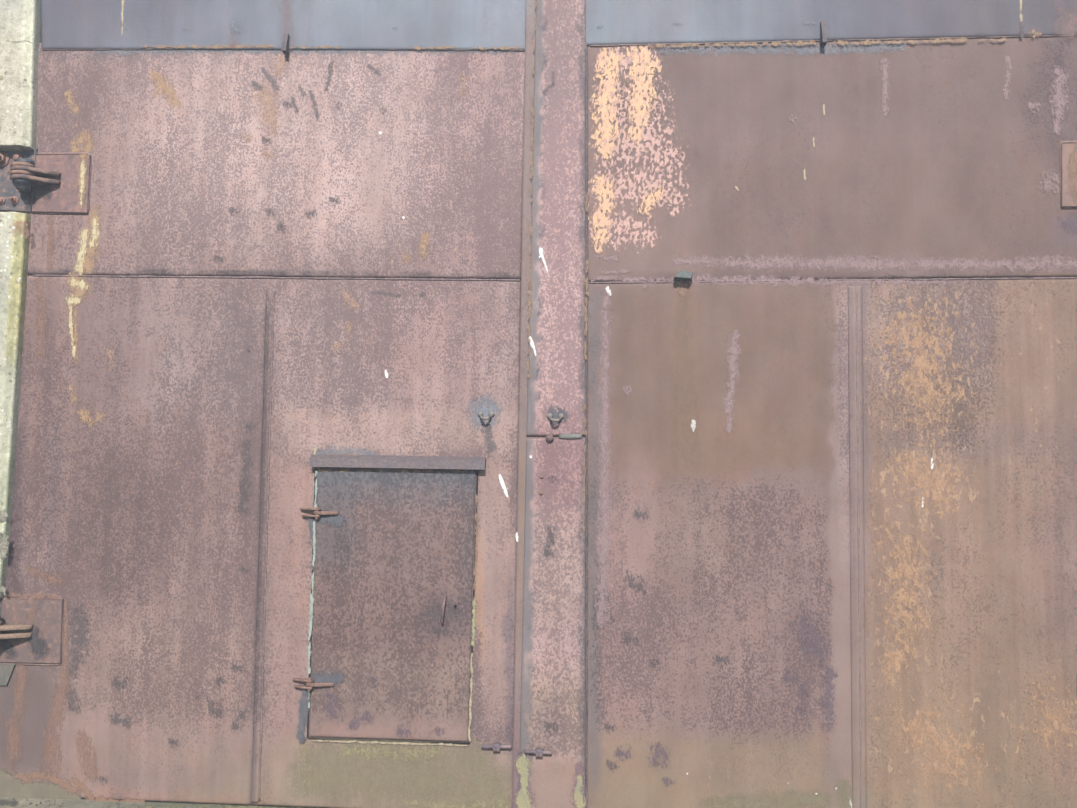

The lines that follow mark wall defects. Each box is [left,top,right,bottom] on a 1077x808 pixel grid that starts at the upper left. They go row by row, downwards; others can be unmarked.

rust [64,90,101,363]
peeling [588,45,692,254]